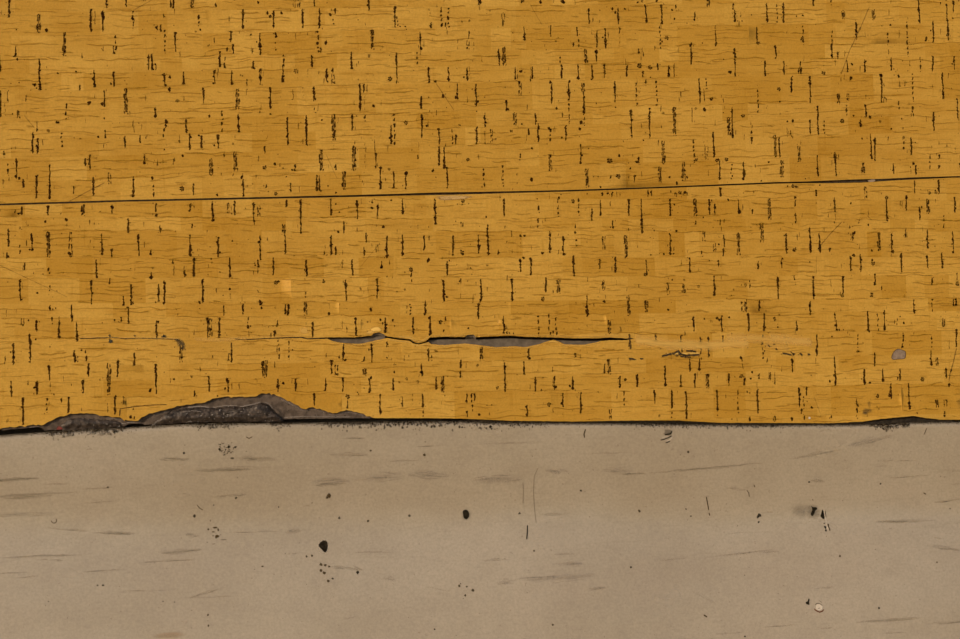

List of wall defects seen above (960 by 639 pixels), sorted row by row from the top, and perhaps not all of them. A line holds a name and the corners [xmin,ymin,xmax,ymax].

crack [237,327,748,349]
spalling [1,393,372,431]